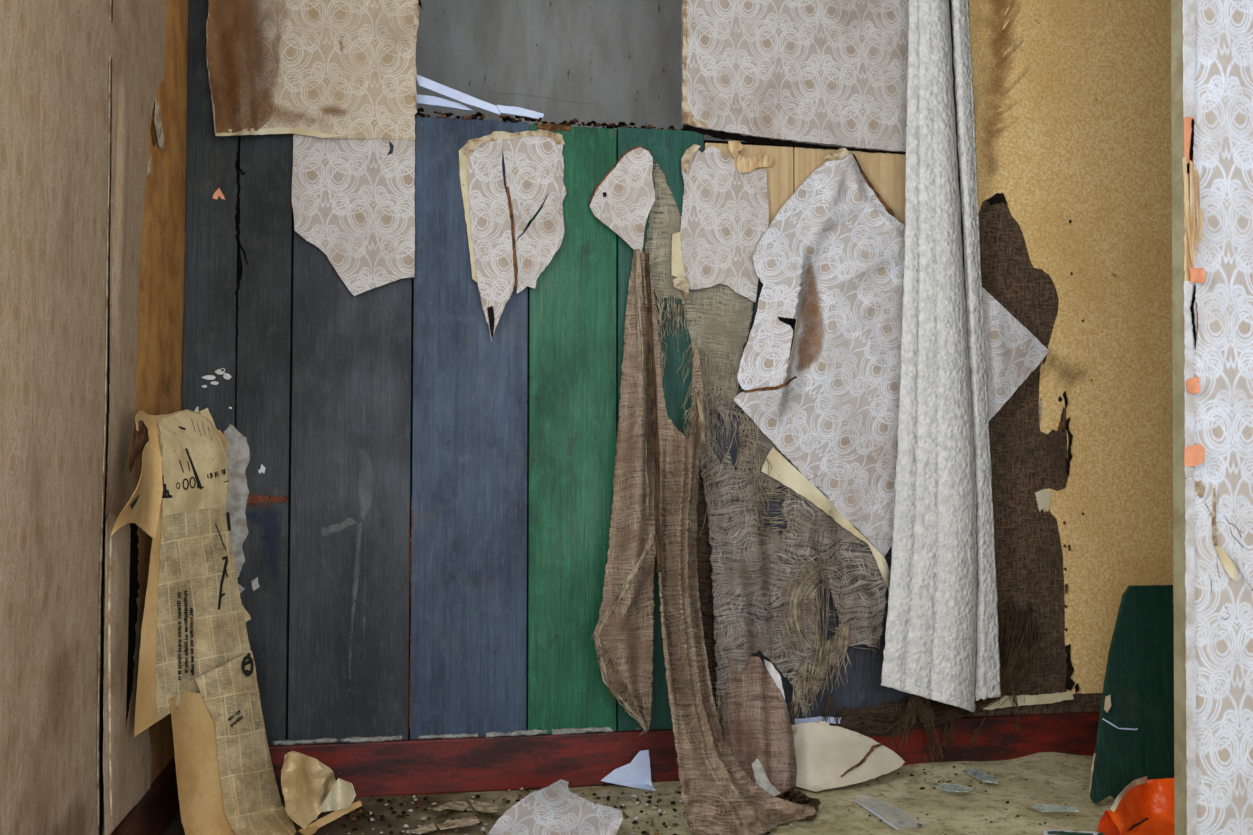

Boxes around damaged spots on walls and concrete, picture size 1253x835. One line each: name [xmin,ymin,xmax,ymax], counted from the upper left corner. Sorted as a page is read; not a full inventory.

damp [207,0,298,134]
peeling [147,98,164,176]
peeling [681,144,701,174]
peeling [728,141,773,173]
peeling [987,193,1008,205]
peeling [201,368,232,388]
peeling [194,406,265,622]